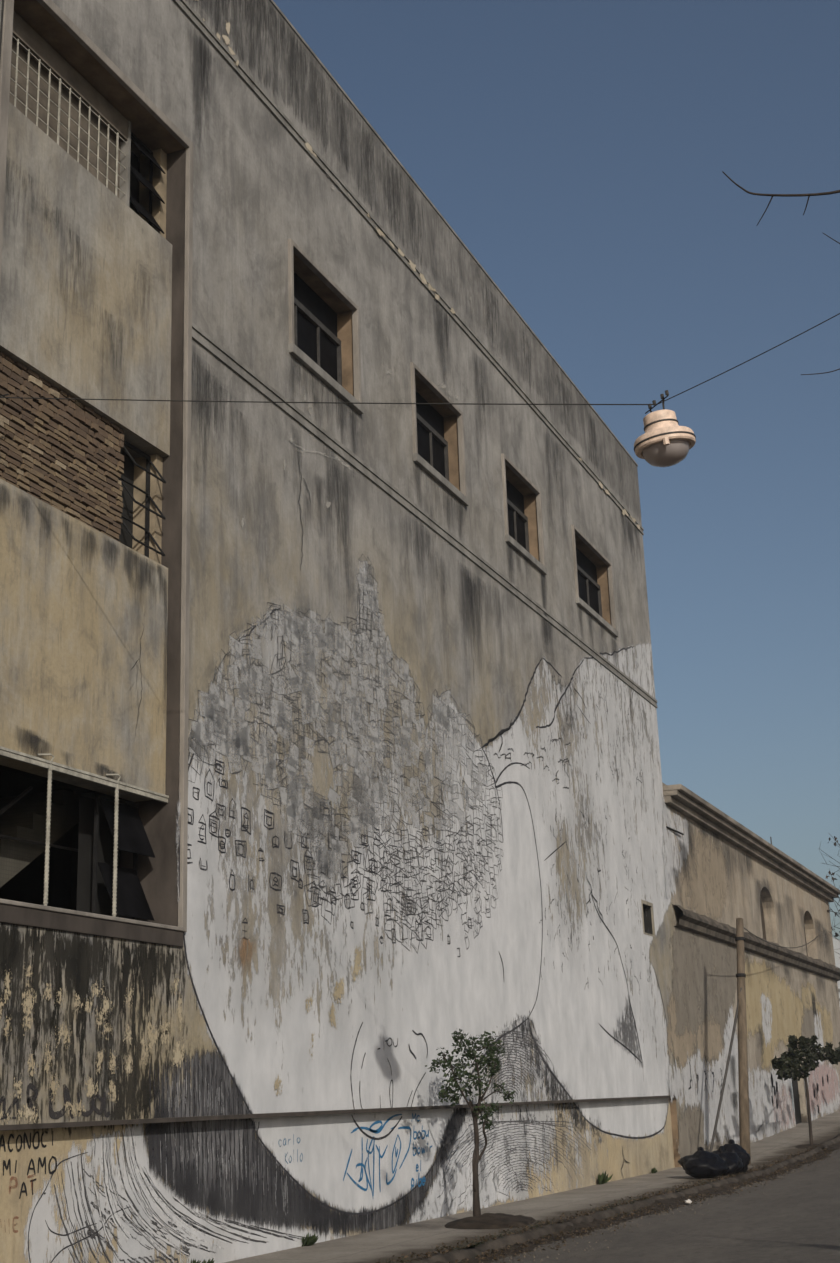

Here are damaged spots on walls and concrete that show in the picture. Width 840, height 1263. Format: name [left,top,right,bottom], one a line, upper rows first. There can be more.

leakage [193,33,206,112]
leakage [109,546,163,589]
leakage [23,730,47,753]
flaking render [662,799,727,919]
peeling [328,945,363,1029]
peeling [0,962,187,1125]
peeling [667,923,840,1158]